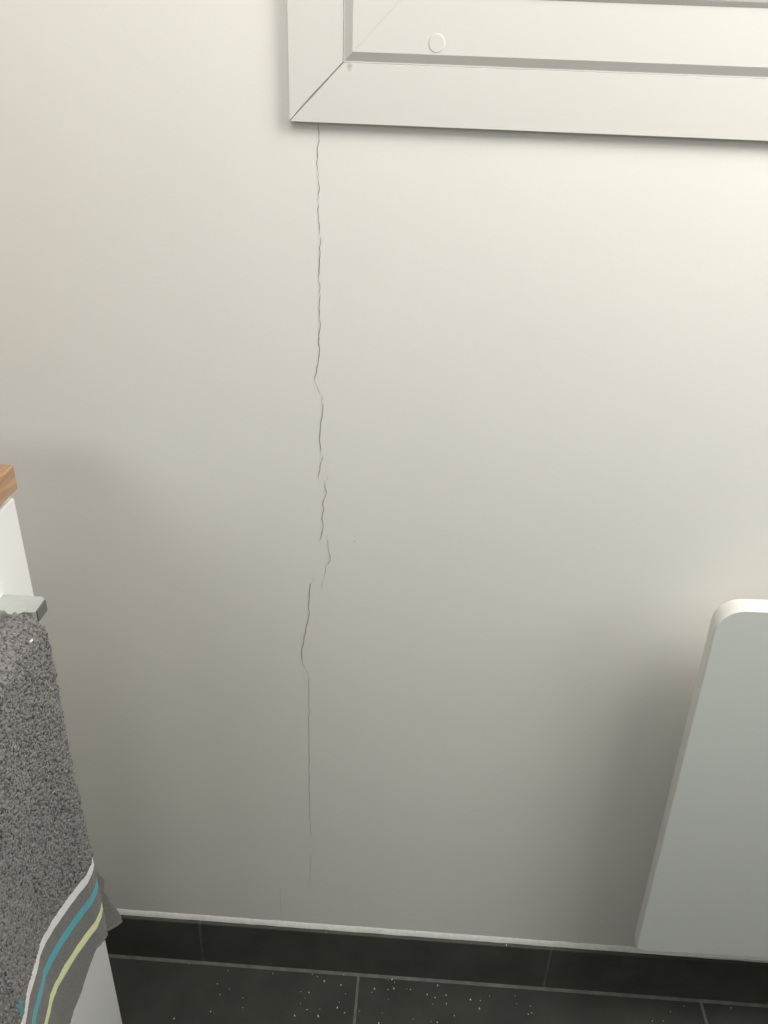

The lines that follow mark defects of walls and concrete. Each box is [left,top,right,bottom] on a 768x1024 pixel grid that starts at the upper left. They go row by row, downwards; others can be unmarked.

crack [301,129,331,724]